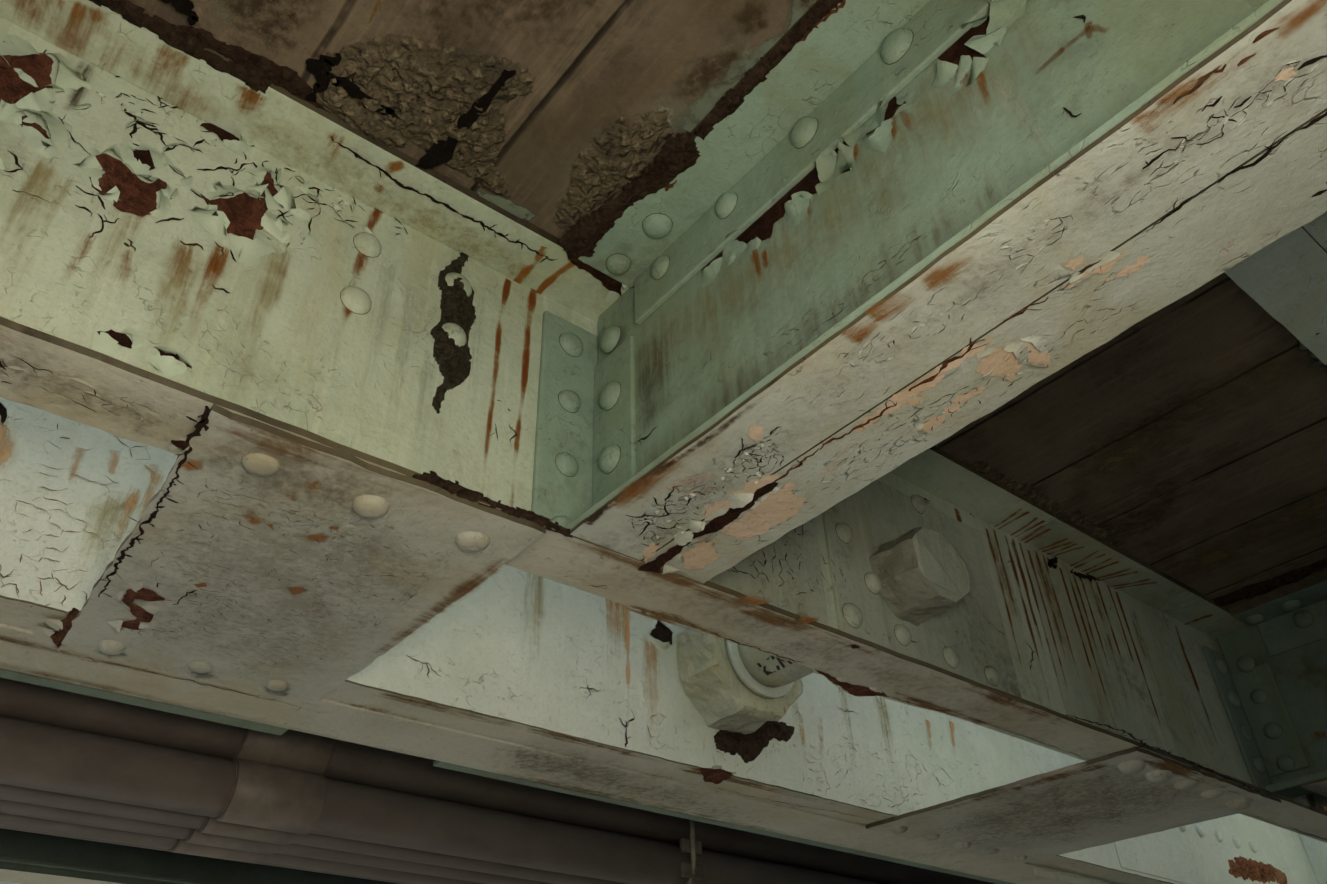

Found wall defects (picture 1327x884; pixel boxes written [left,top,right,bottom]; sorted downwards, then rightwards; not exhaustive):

peeling [0,33,92,159]
water stain [652,47,752,123]
peeling [72,142,174,218]
peeling [187,165,296,268]
peeling [1066,251,1150,290]
peeling [853,335,1050,436]
corrosion [121,470,160,528]
peeling [633,474,808,575]
corrosion [633,563,818,628]
corrosion [986,509,1160,723]
corrosion [544,731,630,755]
corrosion [714,721,822,764]